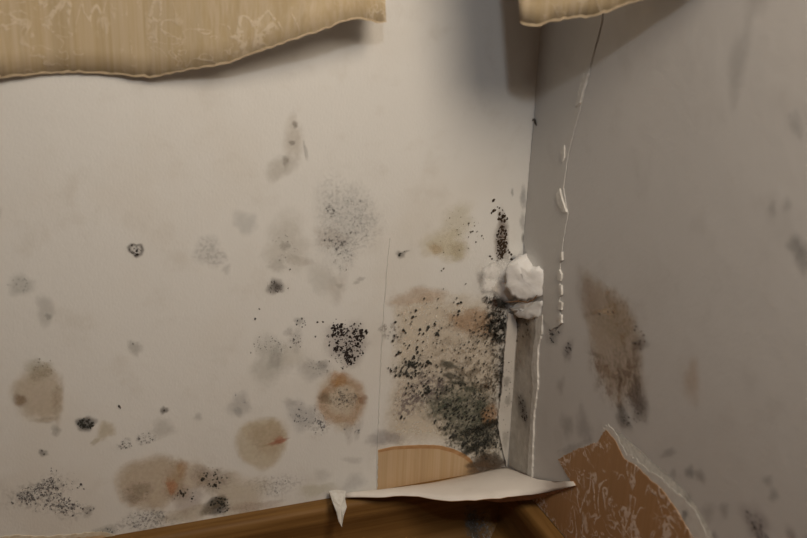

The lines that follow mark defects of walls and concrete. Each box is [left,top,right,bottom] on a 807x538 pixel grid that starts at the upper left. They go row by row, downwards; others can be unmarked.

damp [309,319,368,374]
damp [388,296,527,472]
damp [11,468,94,517]